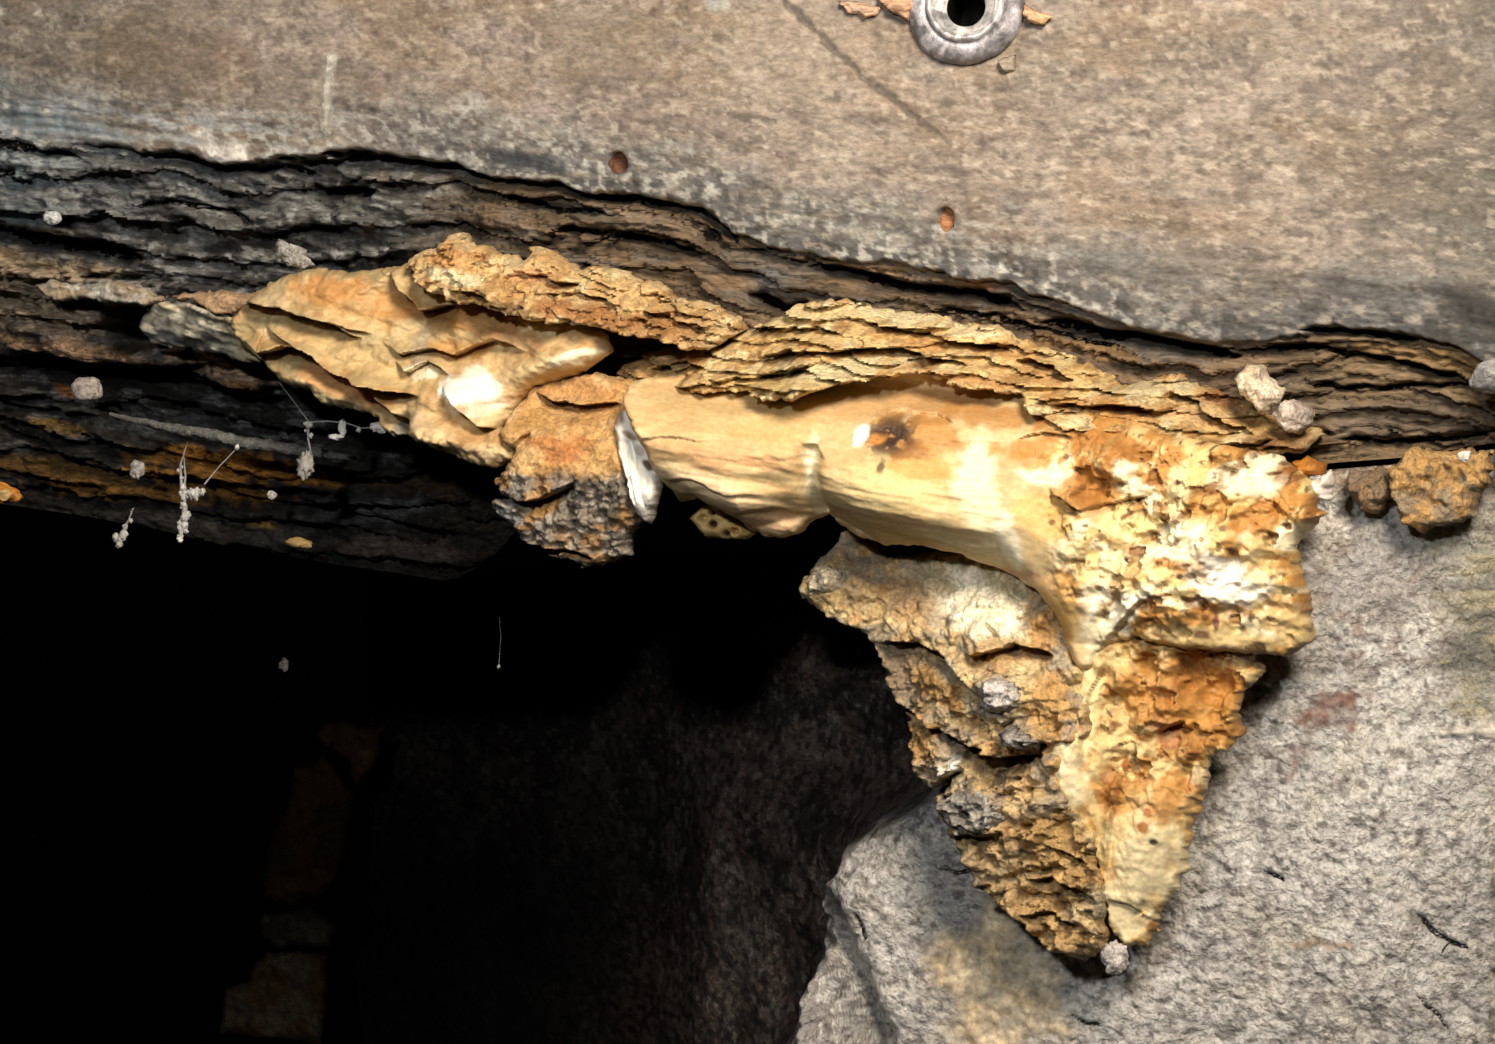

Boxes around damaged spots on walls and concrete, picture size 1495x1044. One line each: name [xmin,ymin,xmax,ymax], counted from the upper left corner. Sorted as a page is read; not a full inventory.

spalling [1469,358,1495,394]
flaking render [1456,450,1471,463]
peeling [1312,469,1334,503]
corrosion [1306,694,1355,730]